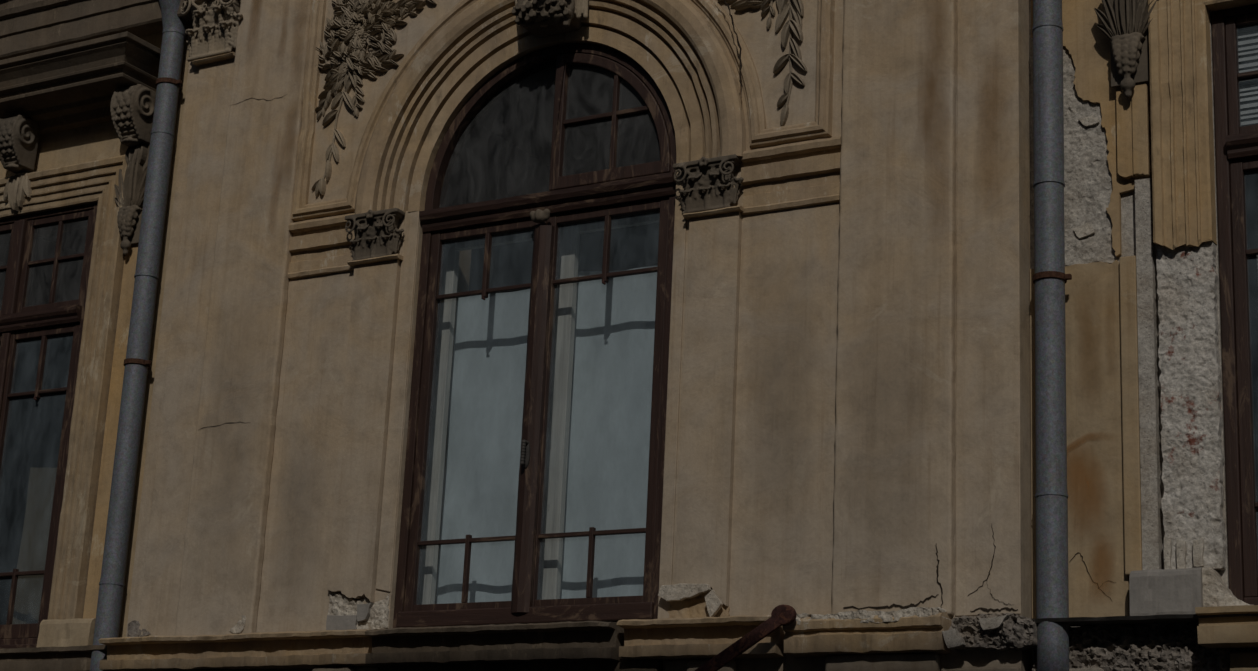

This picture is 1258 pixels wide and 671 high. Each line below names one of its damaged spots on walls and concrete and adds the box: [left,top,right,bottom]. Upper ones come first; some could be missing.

flaking render [1063,47,1121,266]
flaking render [1156,241,1250,607]
crack [843,526,1018,612]
crack [1070,552,1116,599]
flaking render [326,592,390,630]
flaking render [795,607,1037,671]
flaking render [1069,622,1232,671]